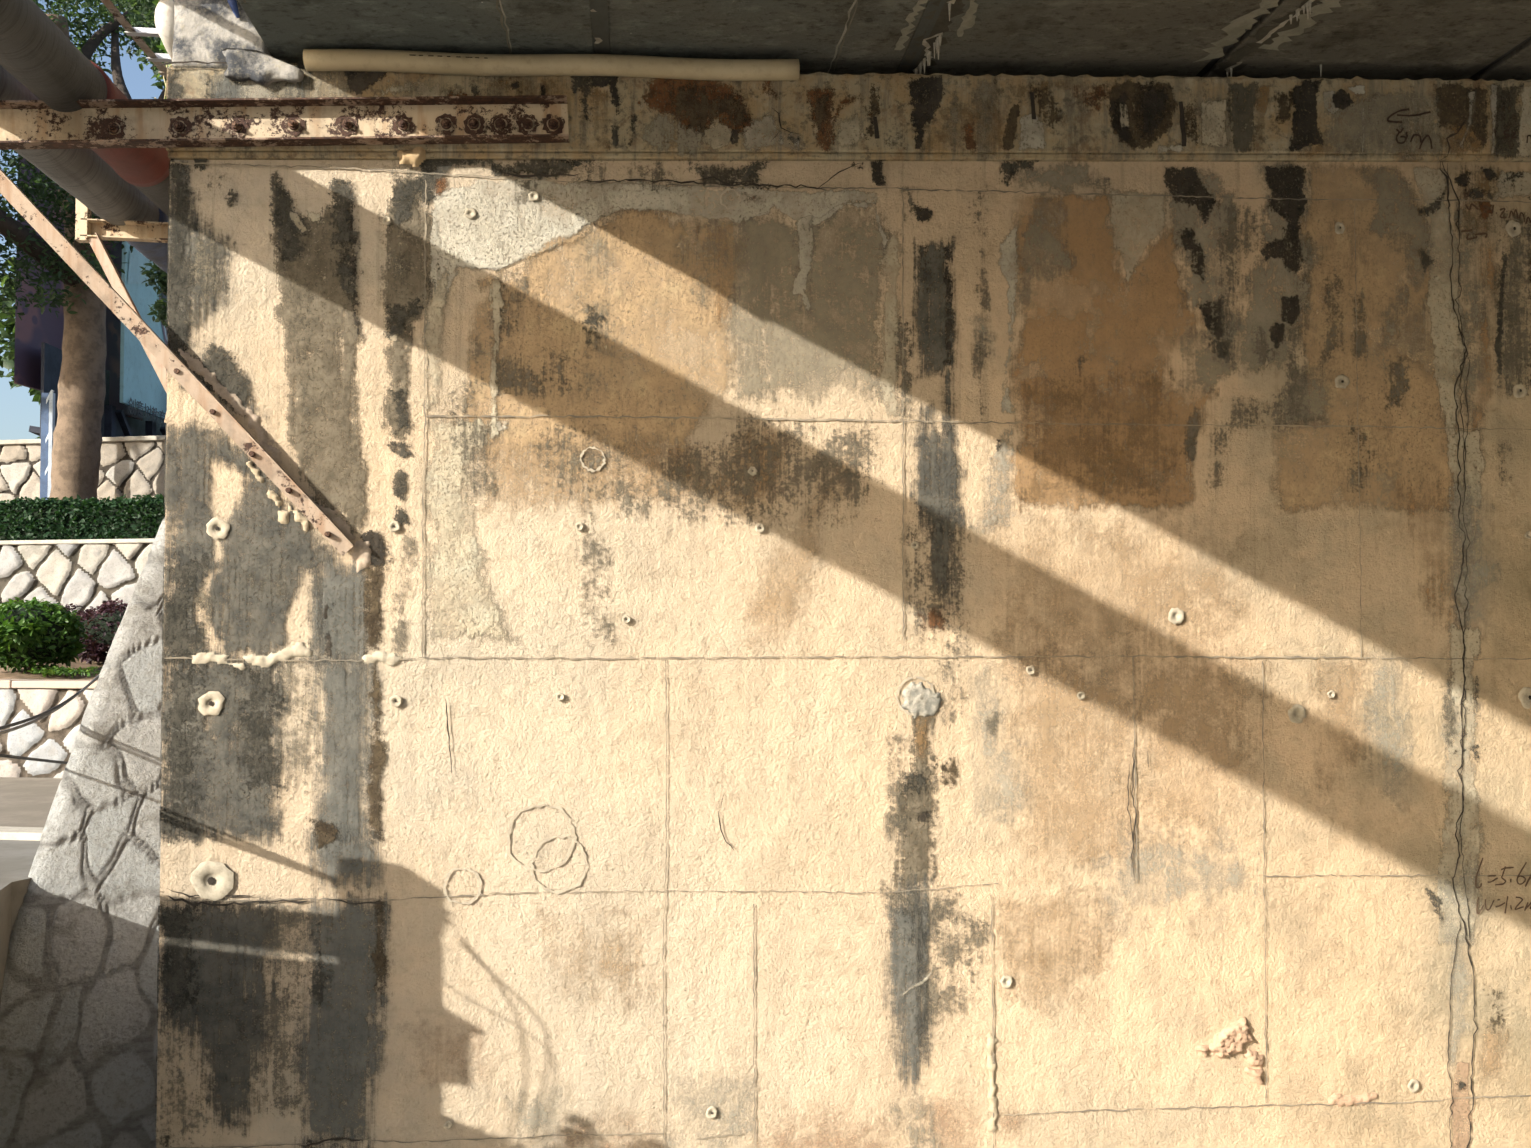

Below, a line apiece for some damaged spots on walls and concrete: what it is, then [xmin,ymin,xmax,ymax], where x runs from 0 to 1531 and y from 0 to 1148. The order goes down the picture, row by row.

rust [101,116,125,139]
rust [391,113,416,136]
rust [435,112,565,135]
rust [624,78,905,155]
leakage [894,0,1110,192]
peeling [421,177,888,643]
peeling [1181,335,1237,393]
leakage [155,67,622,1148]
leakage [448,160,1019,1148]
leakage [1163,0,1531,1148]
crack [1439,120,1478,1148]
crack [1127,748,1149,884]